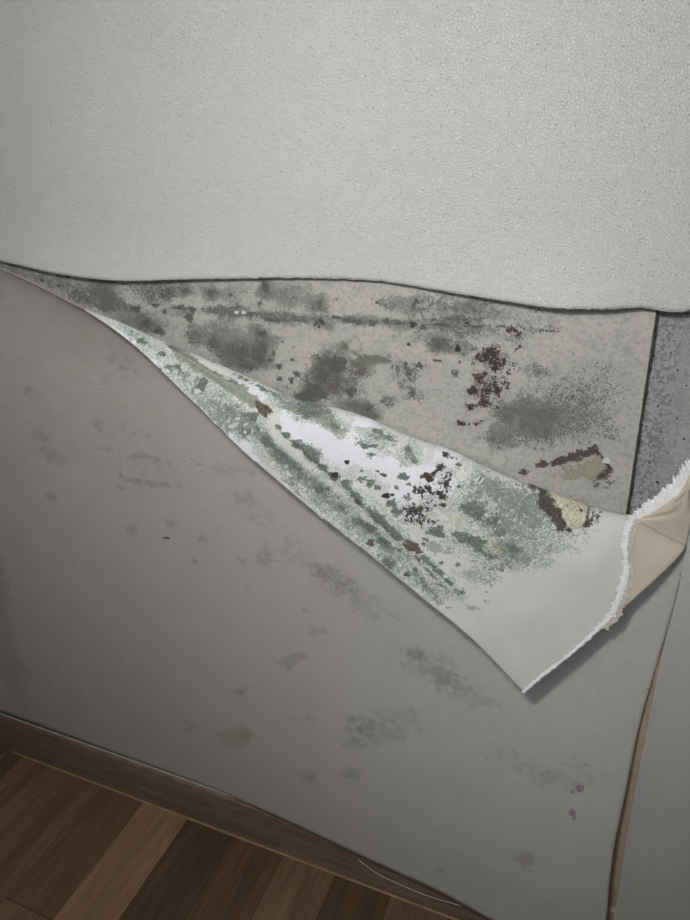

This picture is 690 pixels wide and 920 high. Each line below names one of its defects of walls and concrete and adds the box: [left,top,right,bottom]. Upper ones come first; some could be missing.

peeling [518,444,615,535]